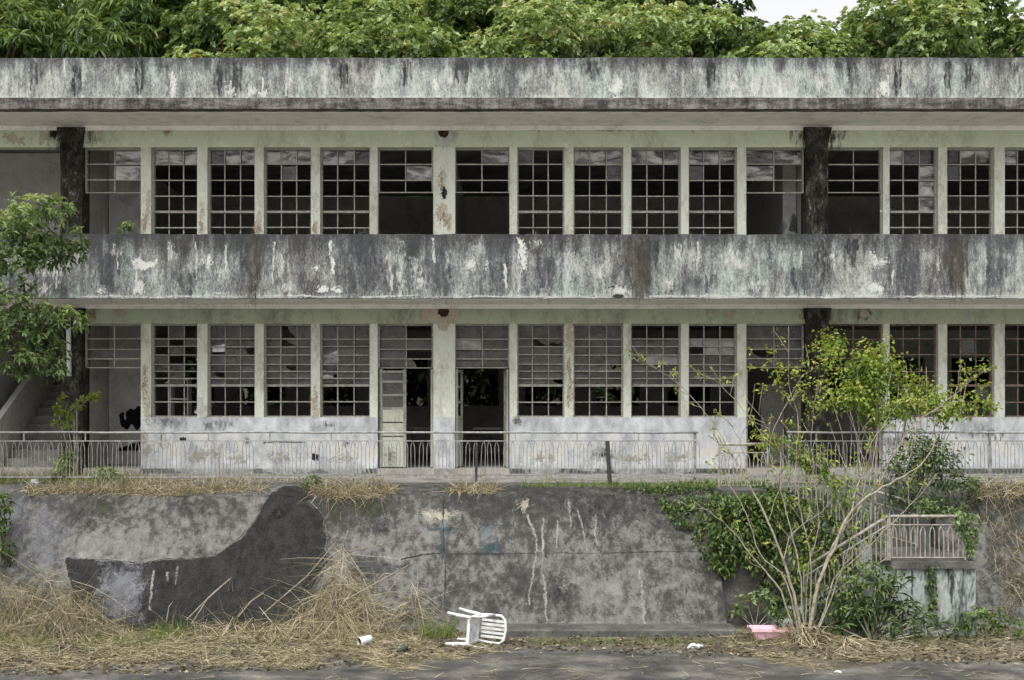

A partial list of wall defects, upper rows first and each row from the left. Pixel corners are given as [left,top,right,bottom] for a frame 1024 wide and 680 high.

water stain [65,65,87,96]
water stain [214,58,243,97]
water stain [337,59,352,88]
water stain [706,59,716,88]
spalling [434,131,460,148]
peeling [81,242,242,319]
spalling [361,237,632,331]
water stain [621,231,660,299]
water stain [846,235,864,265]
water stain [940,231,1012,300]
water stain [94,555,179,623]
water stain [512,494,692,624]